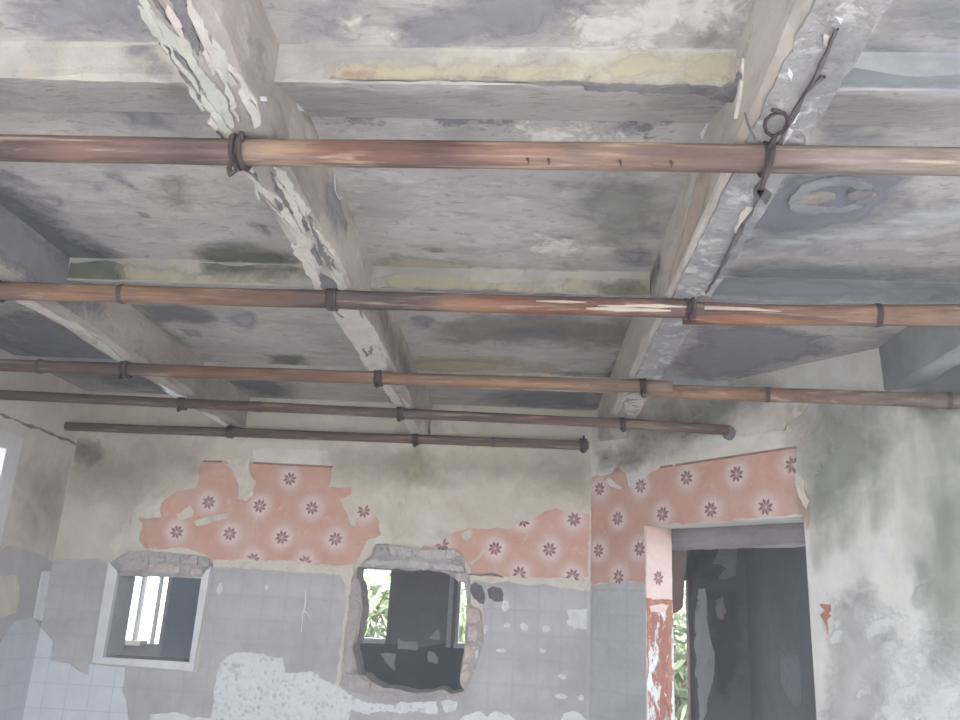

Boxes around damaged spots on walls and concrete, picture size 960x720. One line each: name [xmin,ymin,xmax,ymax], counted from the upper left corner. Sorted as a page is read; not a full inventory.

peeling [138,0,267,138]
water stain [333,62,594,81]
peeling [569,0,745,50]
peeling [245,166,347,290]
water stain [601,400,739,469]
water stain [914,364,960,394]
peeling [0,545,108,675]
peeling [107,543,647,720]